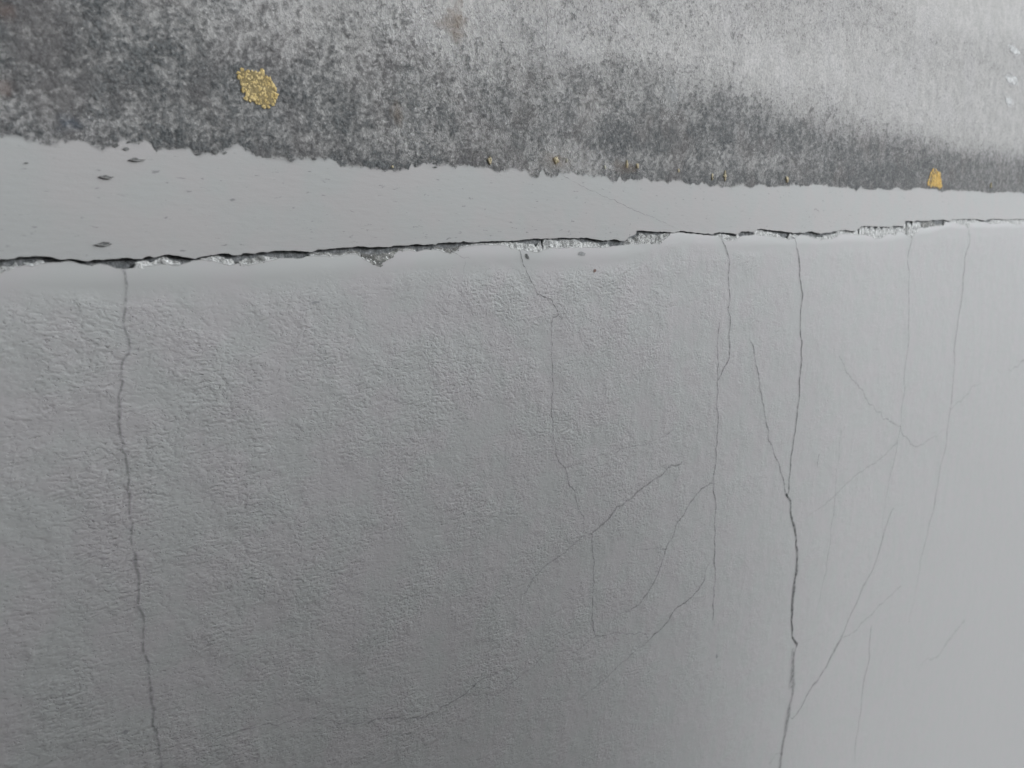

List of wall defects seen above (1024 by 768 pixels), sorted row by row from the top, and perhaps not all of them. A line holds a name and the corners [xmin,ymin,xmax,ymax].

water stain [483,0,1024,193]
crack [0,219,1024,644]